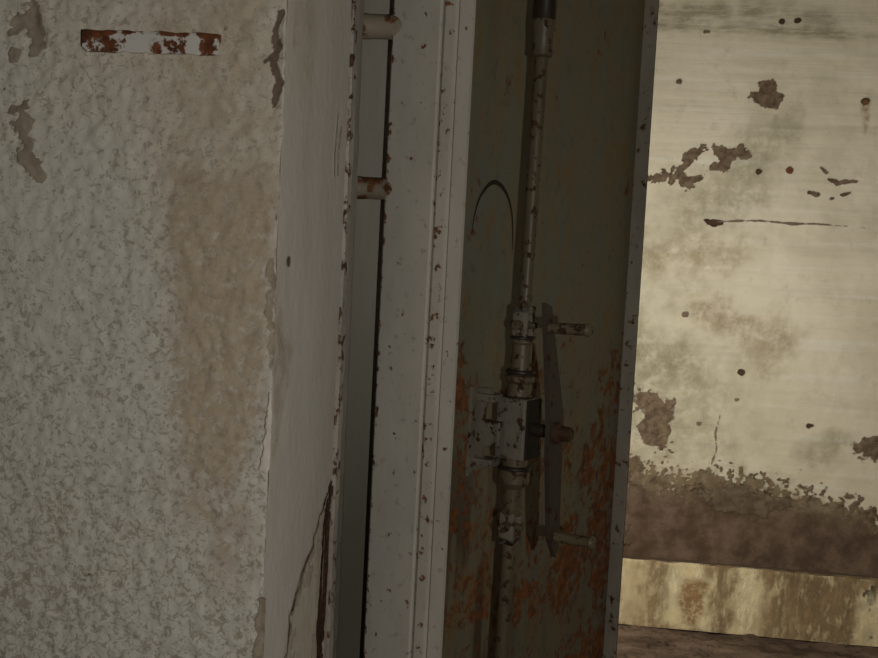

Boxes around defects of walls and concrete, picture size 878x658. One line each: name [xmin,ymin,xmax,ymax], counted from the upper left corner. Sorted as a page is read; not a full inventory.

flaking render [8,0,47,63]
peeling [747,79,784,109]
flaking render [8,99,47,183]
peeling [647,143,752,192]
damp [170,173,270,479]
peeling [623,382,878,577]
flaking render [252,597,266,658]
peeling [286,492,334,658]
damp [648,559,683,628]
damp [706,565,878,646]